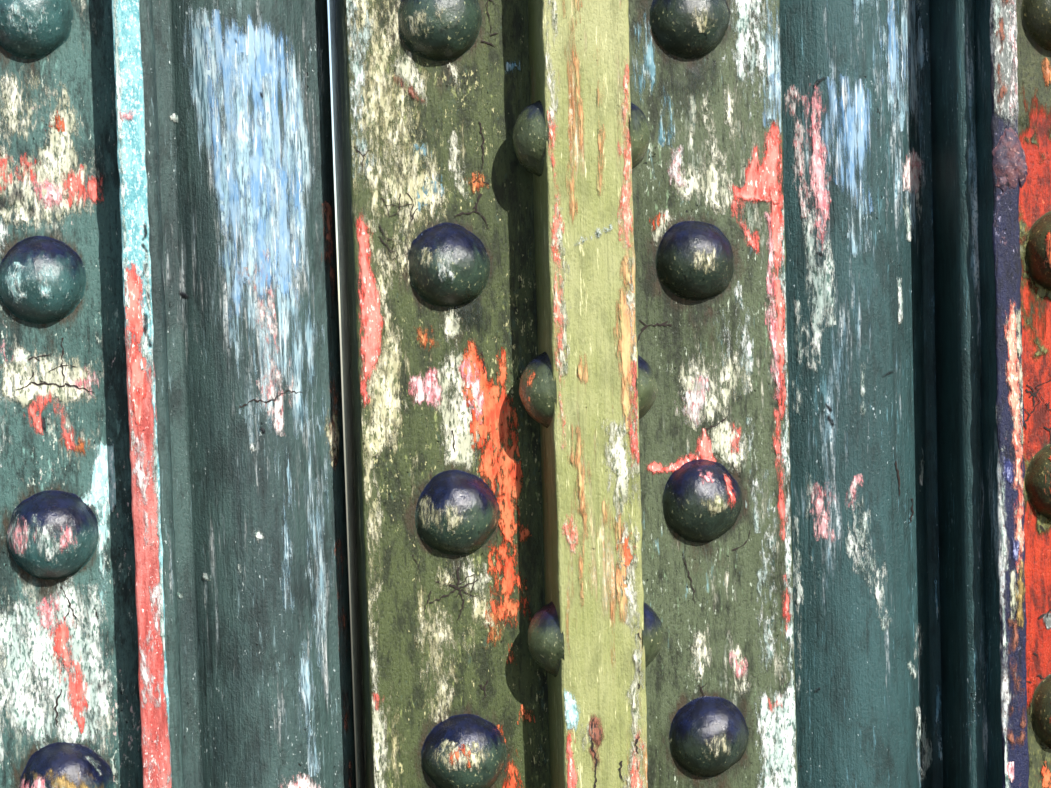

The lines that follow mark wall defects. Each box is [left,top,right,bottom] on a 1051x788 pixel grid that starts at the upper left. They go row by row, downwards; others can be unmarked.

peeling [0,71,104,246]
peeling [114,0,161,549]
peeling [0,343,99,451]
crack [16,338,95,394]
crack [239,390,303,407]
peeling [346,0,531,788]
peeling [647,0,836,788]
crack [1023,374,1051,444]
peeling [0,576,112,761]
peeling [139,565,167,708]
crack [412,554,478,620]
peeling [280,773,320,788]